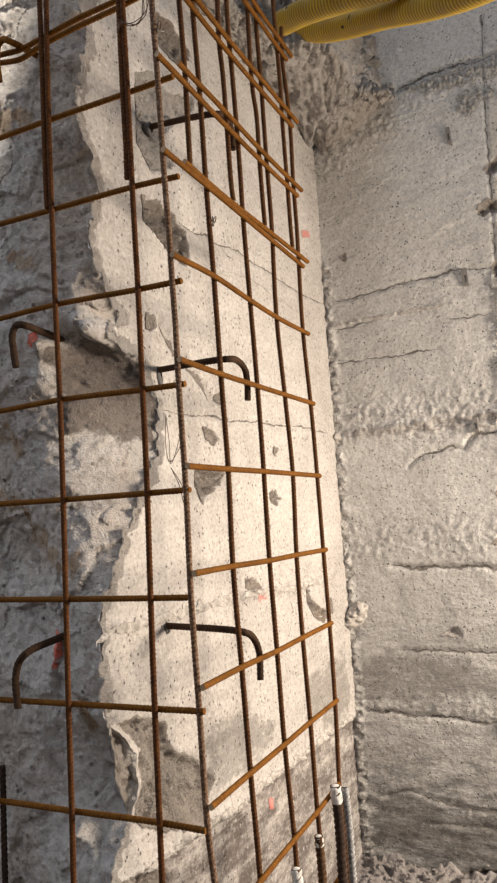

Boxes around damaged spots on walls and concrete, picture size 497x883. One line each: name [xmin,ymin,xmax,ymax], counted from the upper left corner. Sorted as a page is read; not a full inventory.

crack [181,15,497,303]
spalling [483,156,497,178]
spalling [477,198,497,223]
spalling [0,0,342,883]
crack [409,417,497,465]